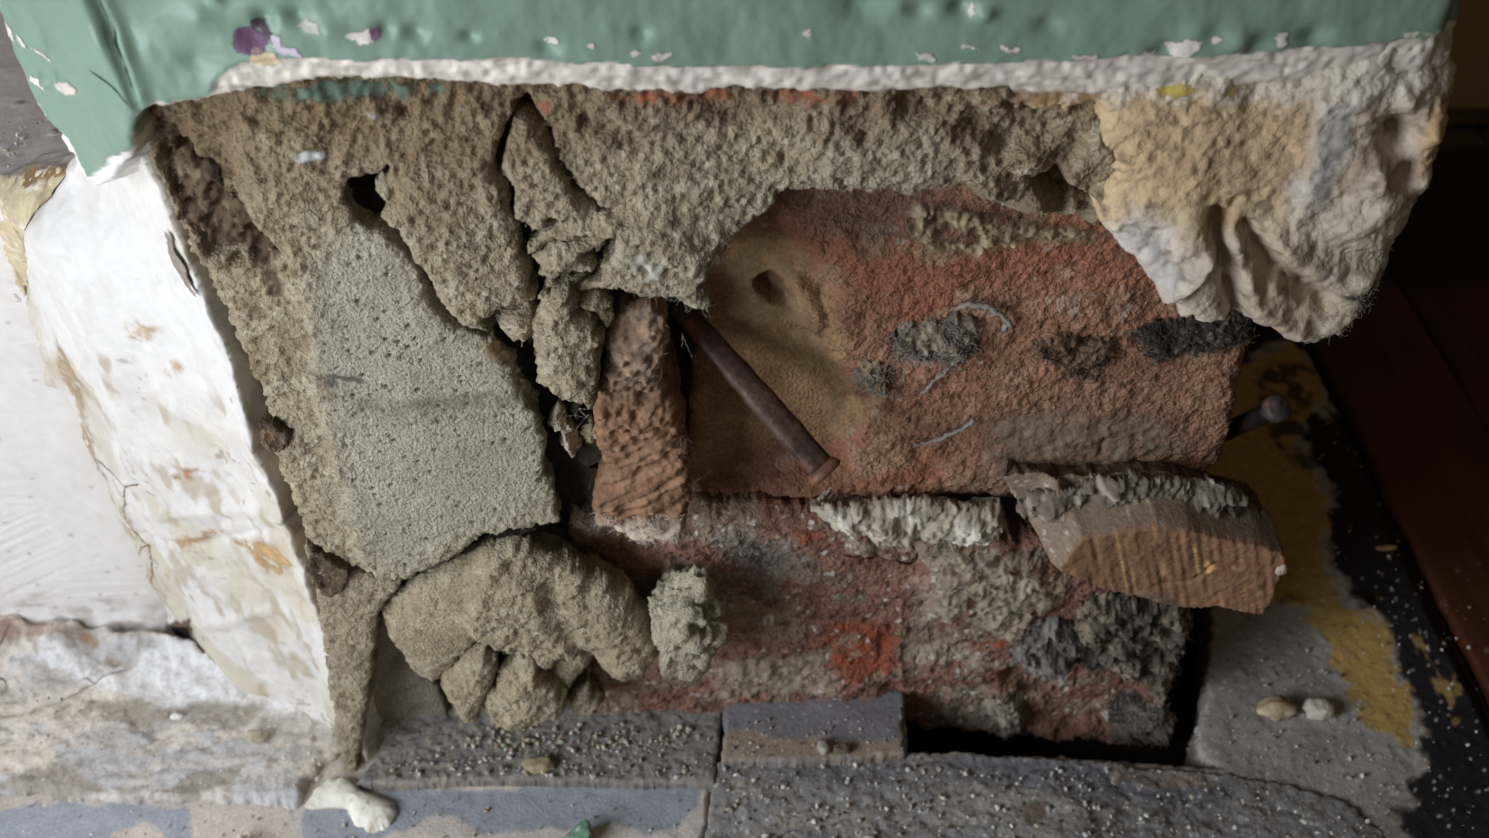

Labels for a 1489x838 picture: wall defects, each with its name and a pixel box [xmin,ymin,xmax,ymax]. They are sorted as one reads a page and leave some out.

spalling [153,132,280,297]
flaking render [911,204,1090,256]
spalling [259,407,293,453]
crack [88,436,155,590]
spalling [305,543,353,597]
peeling [1275,563,1287,575]
spalling [372,619,450,735]